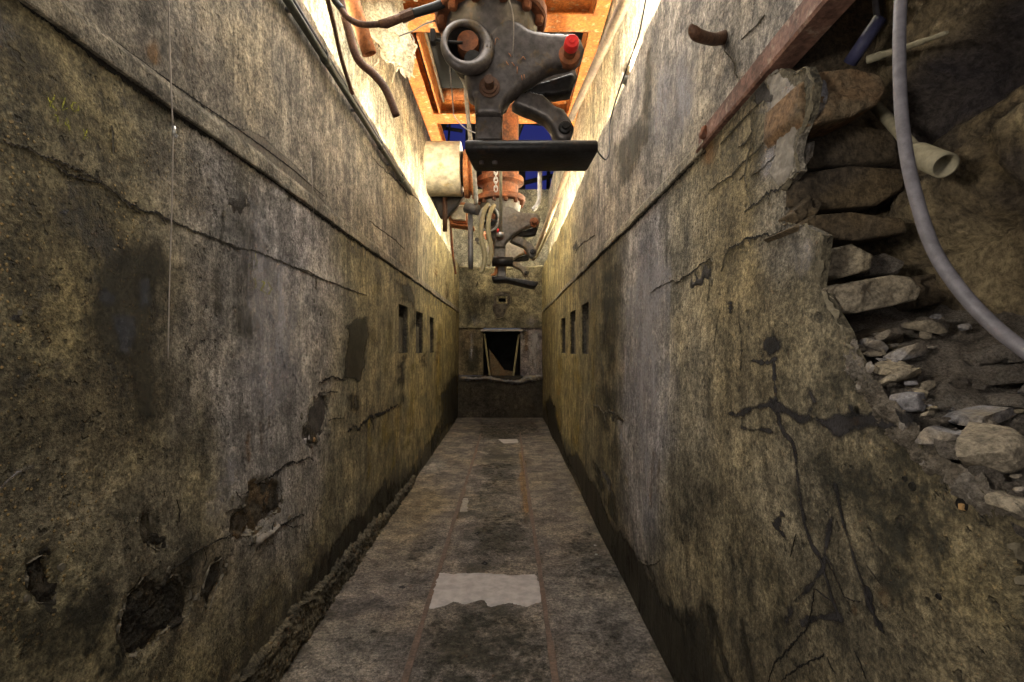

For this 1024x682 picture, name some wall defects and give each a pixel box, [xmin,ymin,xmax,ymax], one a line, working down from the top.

spalling [754,83,773,106]
crack [4,1,458,313]
crack [575,104,800,301]
spalling [690,264,713,289]
spalling [300,388,331,448]
crack [319,375,401,444]
spalling [229,477,291,544]
spalling [23,547,66,615]
spalling [116,556,229,658]
crack [768,559,862,682]